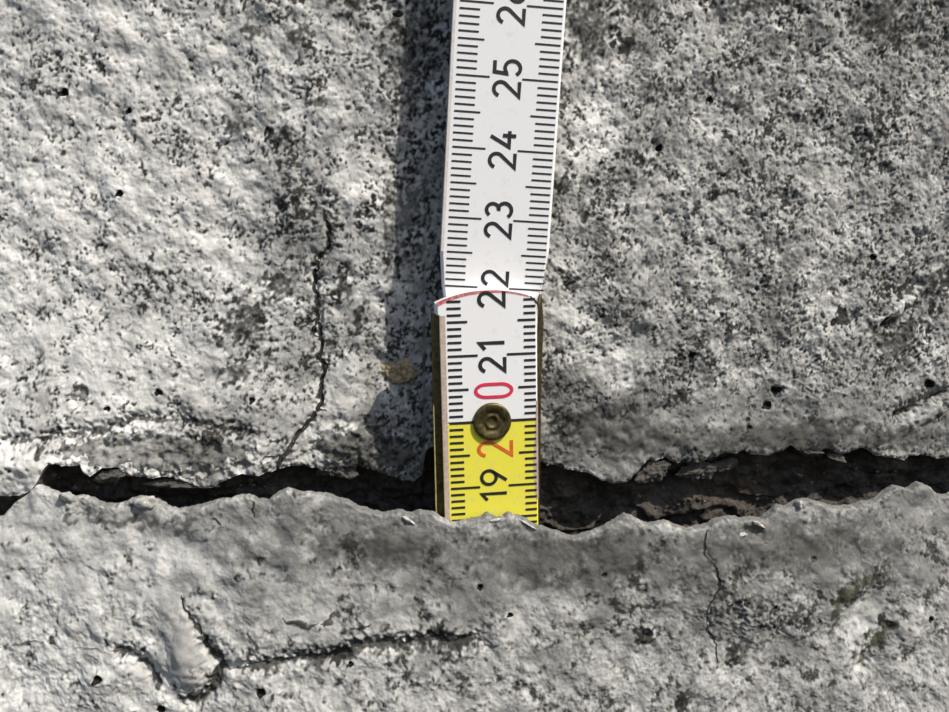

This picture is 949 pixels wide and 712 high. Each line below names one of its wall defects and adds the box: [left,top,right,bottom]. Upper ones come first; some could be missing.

crack [0,208,435,526]
crack [540,445,949,663]